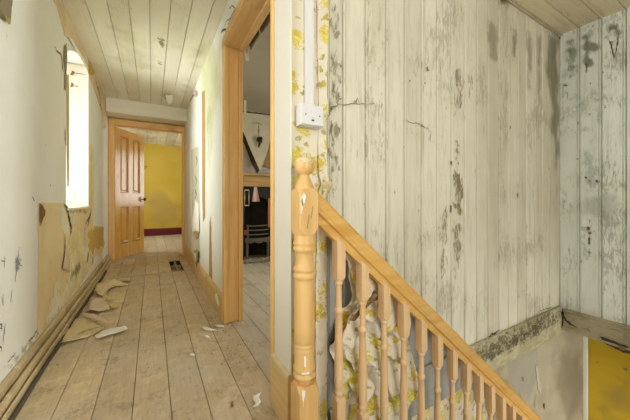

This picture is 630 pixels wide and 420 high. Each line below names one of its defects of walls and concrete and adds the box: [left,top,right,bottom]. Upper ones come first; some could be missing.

leakage [584,36,598,72]
crack [328,97,374,116]
peeling [23,144,105,351]
leakage [477,311,561,362]